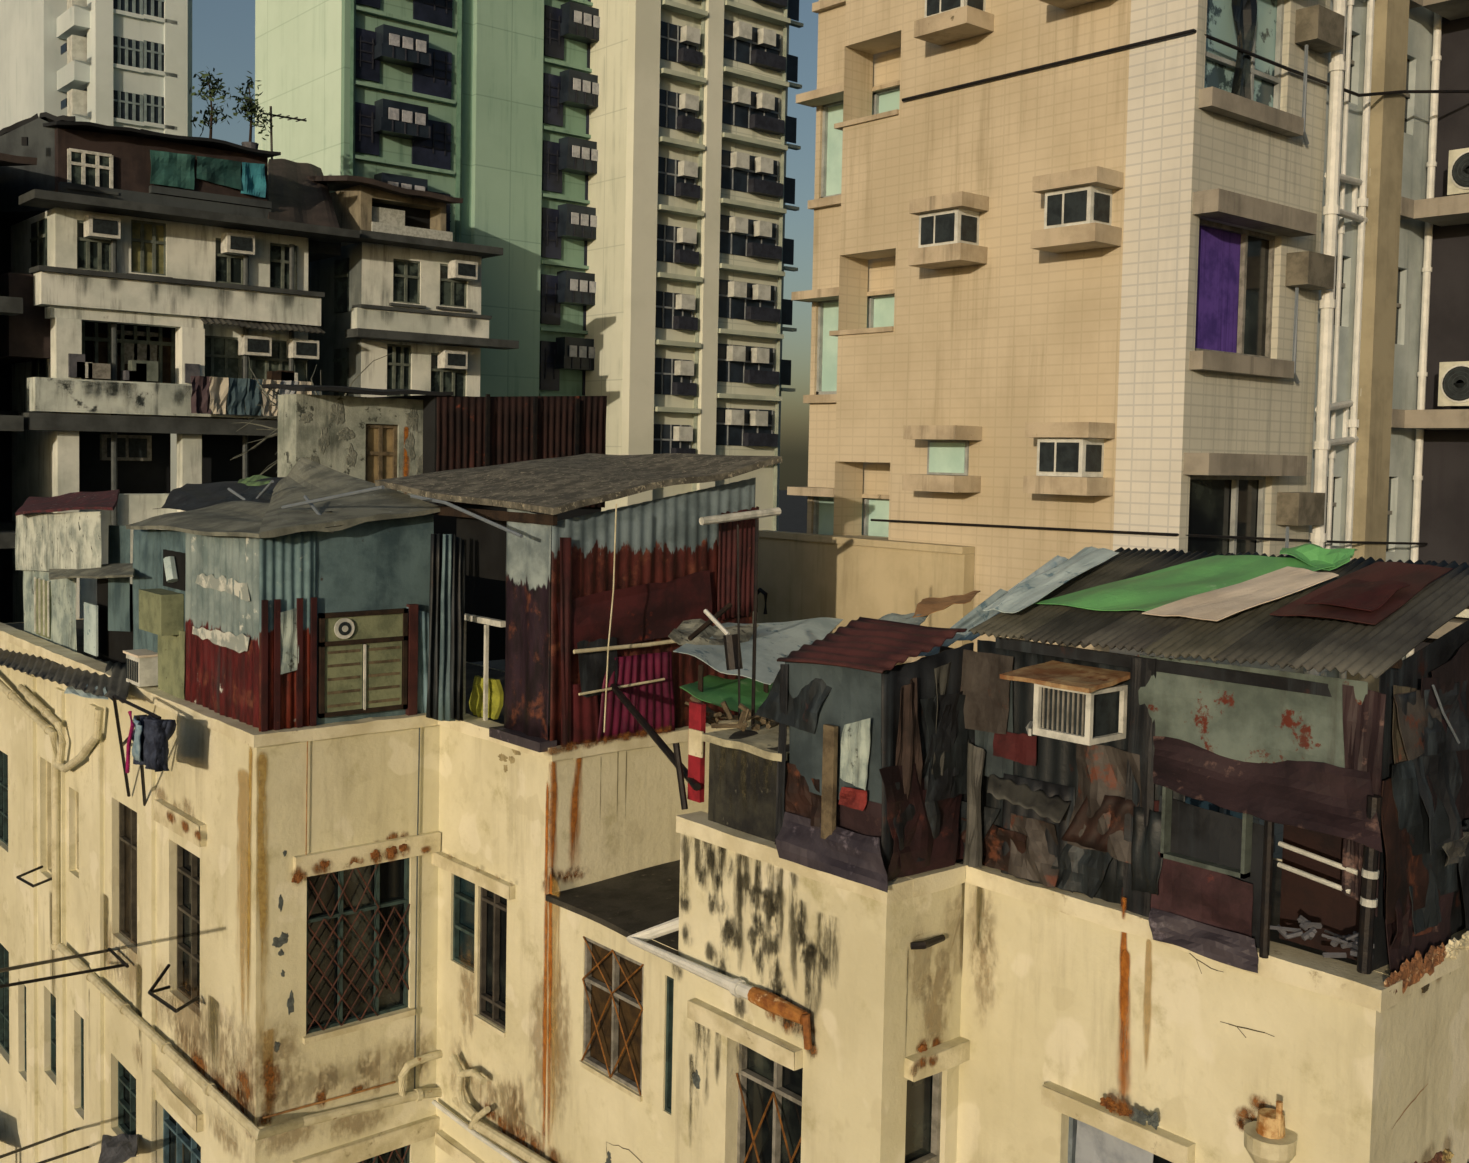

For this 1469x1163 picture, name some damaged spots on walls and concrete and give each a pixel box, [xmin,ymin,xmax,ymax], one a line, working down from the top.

rust [247,747,267,972]
rust [291,860,330,884]
rust [350,833,430,865]
rust [485,726,671,1163]
water stain [682,835,837,1025]
rust [1120,897,1130,1090]
rust [1237,1097,1266,1130]